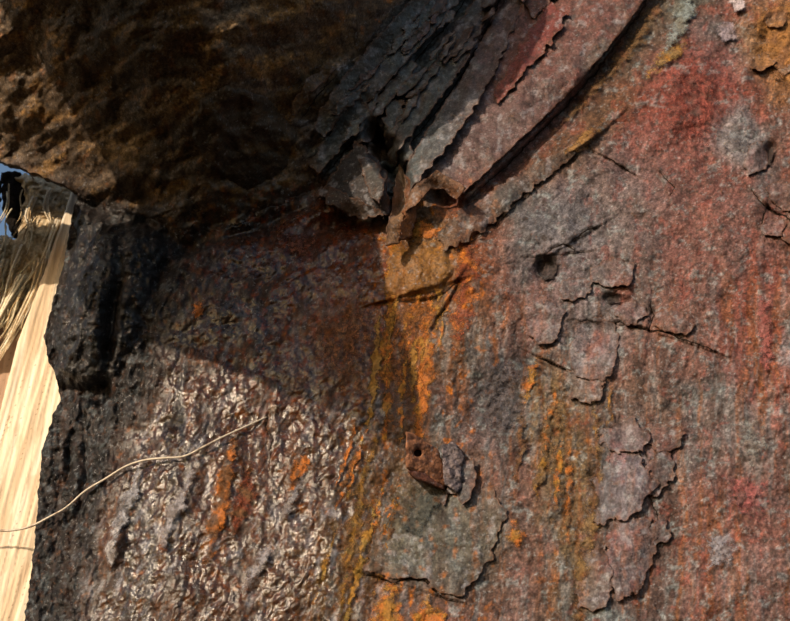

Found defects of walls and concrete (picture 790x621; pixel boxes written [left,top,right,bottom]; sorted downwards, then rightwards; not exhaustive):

peeling [494,0,569,104]
rust [750,1,790,86]
peeling [436,143,576,251]
crack [547,227,595,253]
crack [376,283,457,311]
crack [536,356,566,371]
peeling [565,257,695,404]
crack [615,307,717,352]
rust [321,237,483,621]
rust [202,431,258,565]
rust [532,379,614,621]
peeling [574,415,686,612]